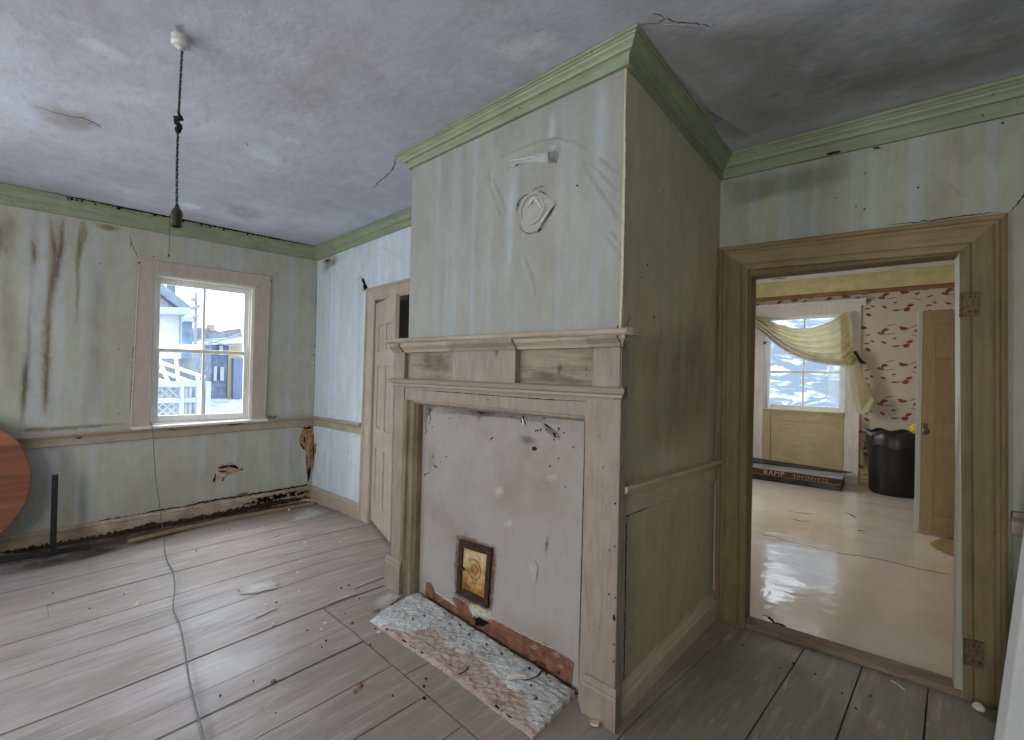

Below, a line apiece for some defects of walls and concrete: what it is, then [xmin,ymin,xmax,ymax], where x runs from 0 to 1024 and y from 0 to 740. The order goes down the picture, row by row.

crack [639,13,714,29]
crack [889,183,1024,225]
flaking render [213,462,244,482]
flaking render [299,425,317,482]
peeling [425,582,574,689]